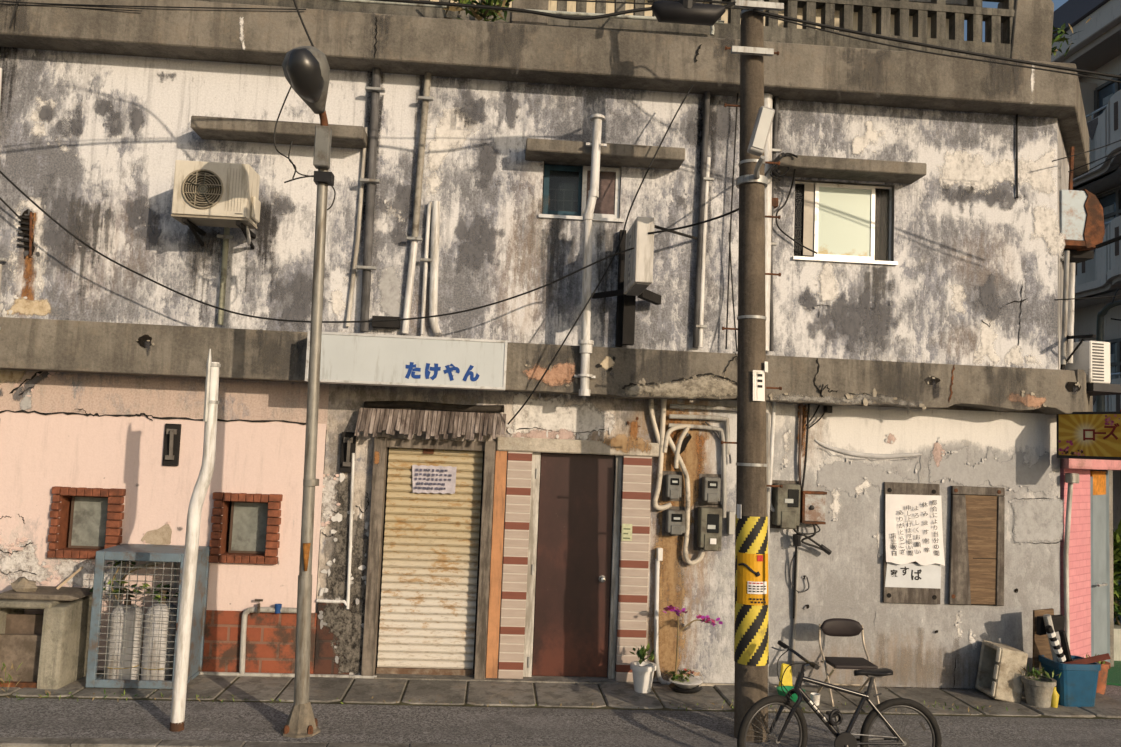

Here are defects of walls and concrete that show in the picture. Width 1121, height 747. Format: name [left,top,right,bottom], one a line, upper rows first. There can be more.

corrosion [21,255,36,301]
damp [69,192,114,297]
damp [246,201,278,301]
damp [542,219,575,299]
damp [865,266,894,305]
crack [0,409,306,425]
peeling [506,362,615,440]
spalling [622,373,737,403]
crack [813,358,838,397]
peeling [0,516,116,601]
peeling [318,472,369,675]
corrosion [604,408,709,678]